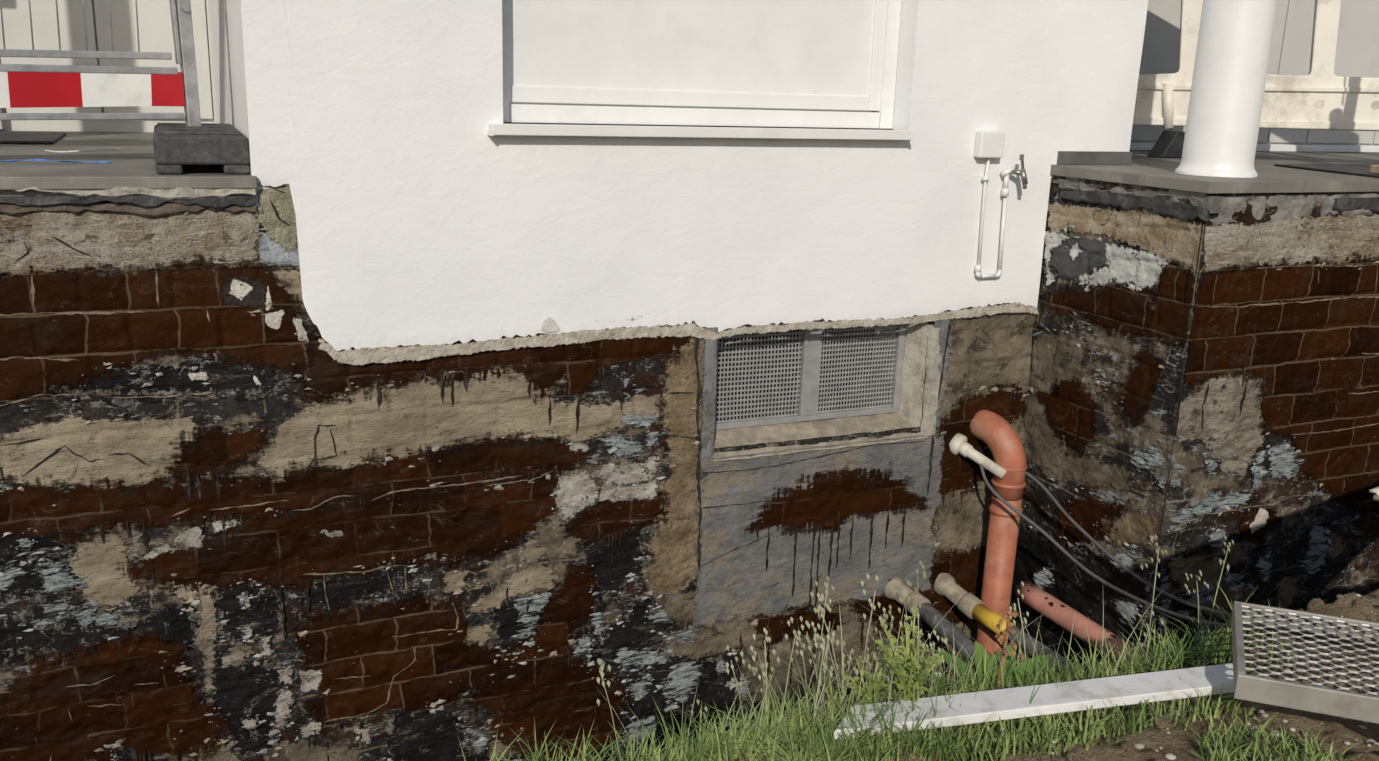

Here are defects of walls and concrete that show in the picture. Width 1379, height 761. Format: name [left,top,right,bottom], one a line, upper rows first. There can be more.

damp [0,254,697,761]
spalling [0,185,1379,761]
damp [744,377,1099,690]
damp [1054,490,1131,554]
damp [1043,252,1379,514]
damp [1236,495,1281,550]